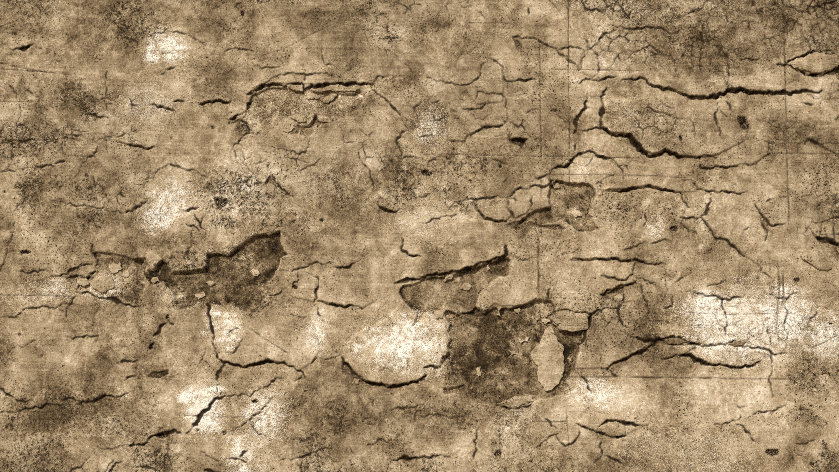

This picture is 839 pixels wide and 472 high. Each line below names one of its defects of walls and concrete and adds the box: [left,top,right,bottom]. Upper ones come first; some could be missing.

crack [153,48,425,159]
crack [428,0,839,257]
crack [0,202,138,318]
crack [0,321,174,412]
flaking render [79,232,298,312]
crack [107,303,305,472]
flaking render [342,363,360,384]
crack [378,205,397,213]
crack [395,244,525,284]
flaking render [399,257,591,407]
crack [546,419,647,463]
crack [562,213,792,441]